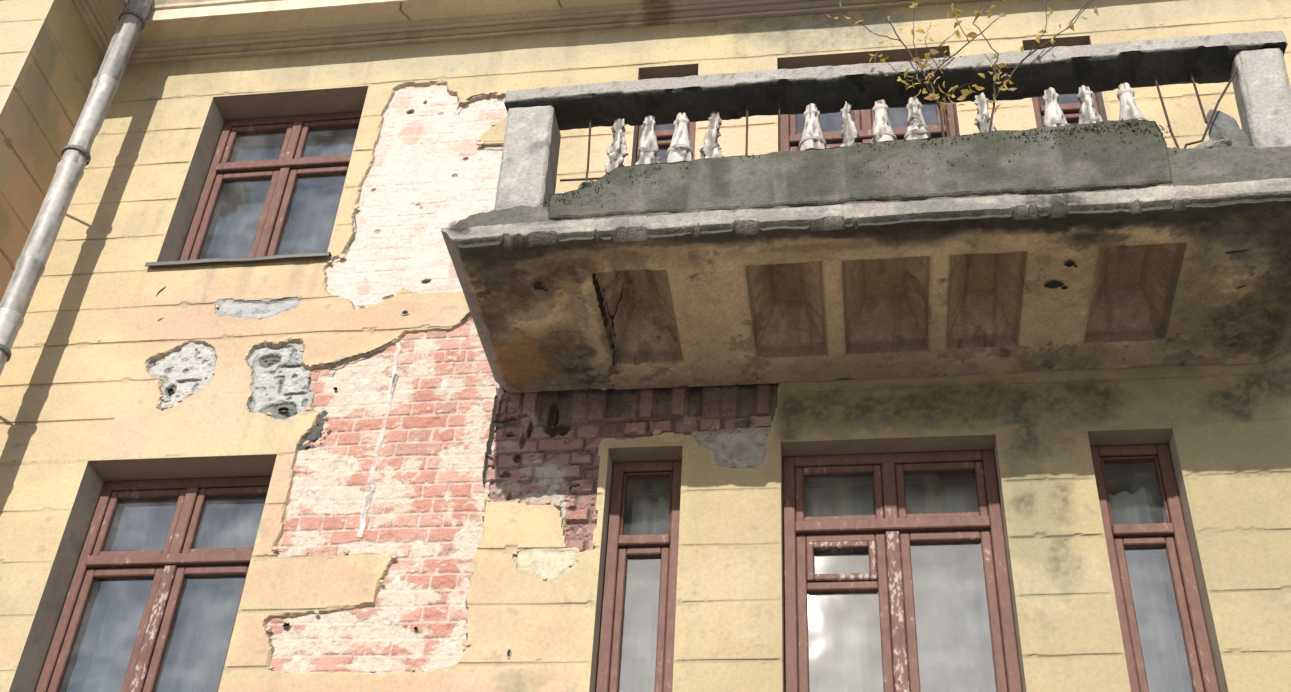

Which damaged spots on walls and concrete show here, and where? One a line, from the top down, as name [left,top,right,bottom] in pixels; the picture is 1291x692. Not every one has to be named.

spalling [560,114,601,182]
flaking render [326,85,508,309]
peeling [214,297,302,320]
crack [593,273,623,366]
spalling [148,342,216,410]
flaking render [247,316,778,692]